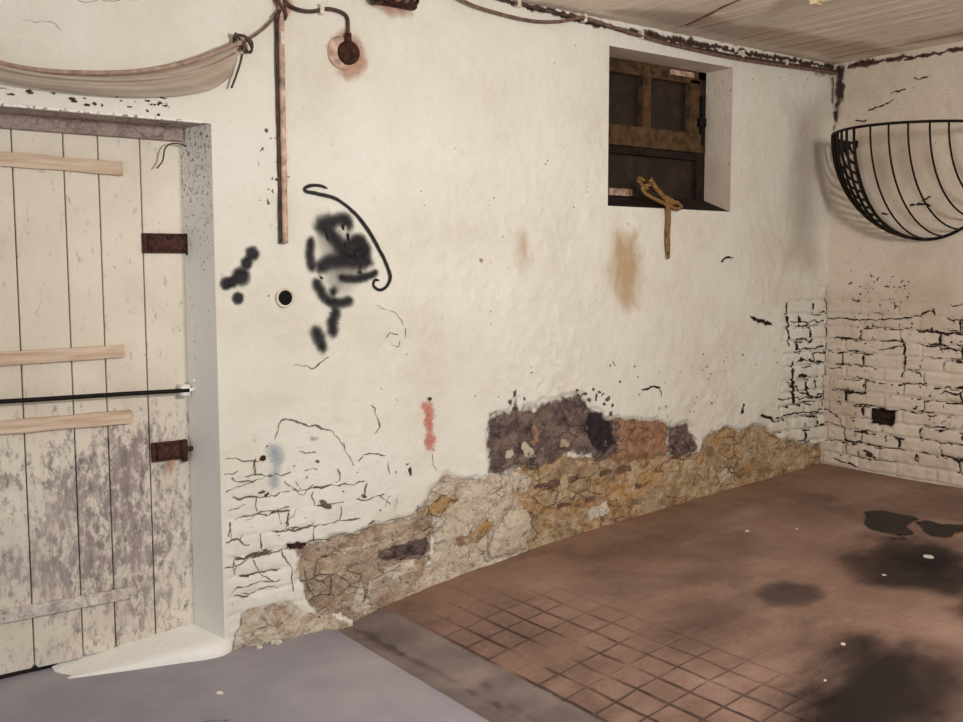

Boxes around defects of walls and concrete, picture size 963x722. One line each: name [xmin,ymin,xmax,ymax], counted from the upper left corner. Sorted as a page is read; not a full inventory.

corrosion [342,33,365,76]
crack [224,405,418,598]
flaking render [278,388,821,622]
damp [762,584,815,603]
damp [853,510,963,593]
damp [798,636,950,722]